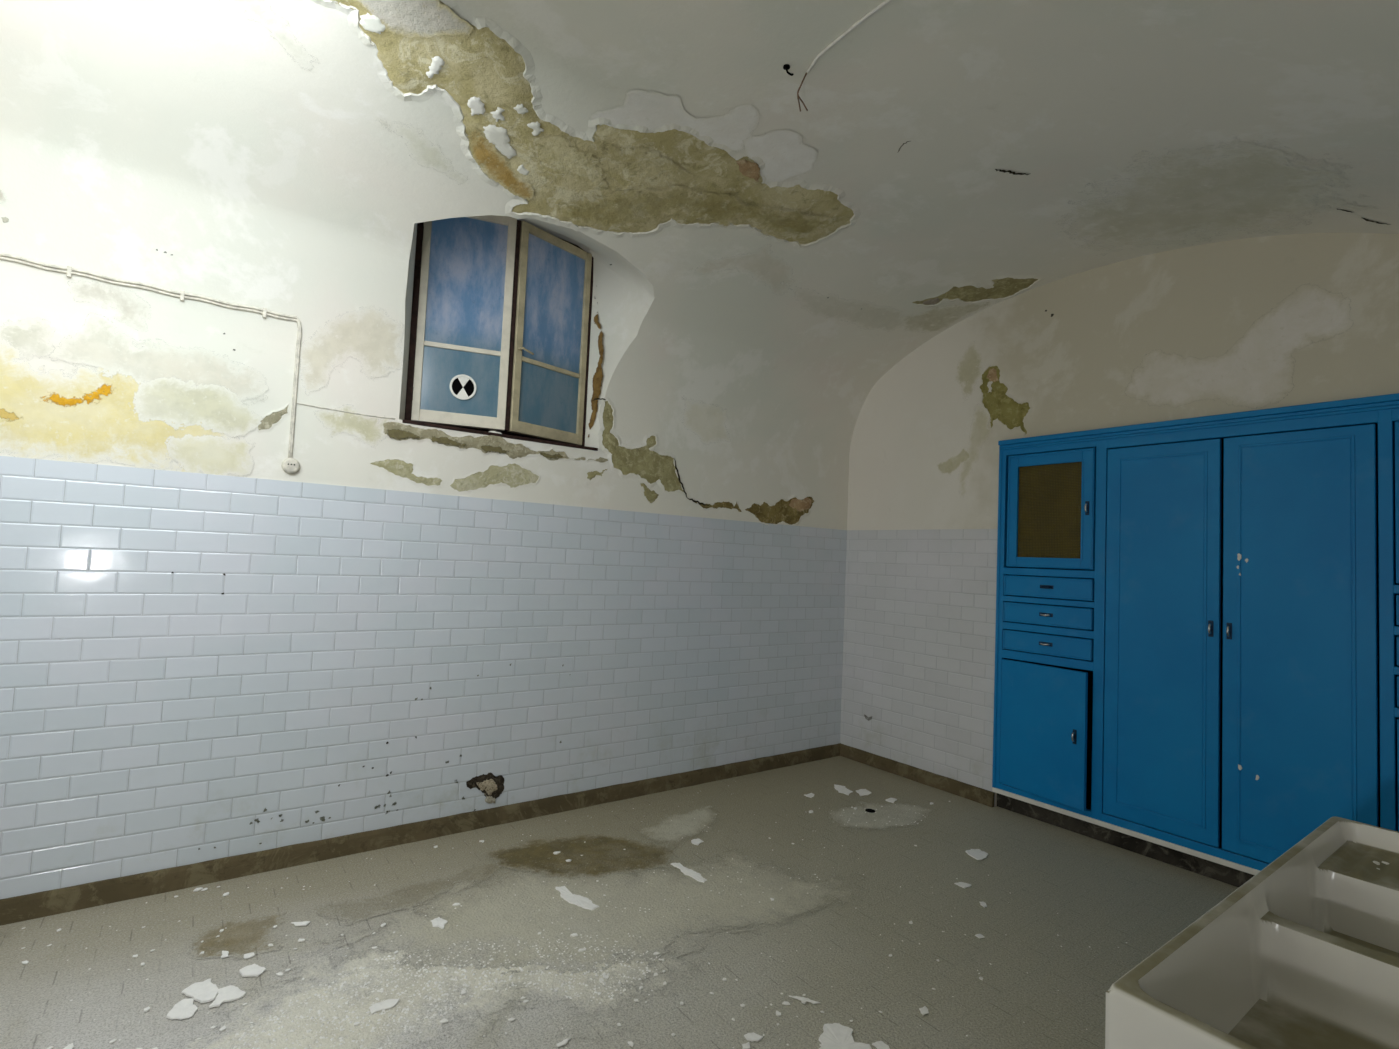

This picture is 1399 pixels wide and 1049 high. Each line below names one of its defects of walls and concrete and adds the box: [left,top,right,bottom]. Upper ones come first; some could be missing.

peeling [311,0,861,248]
leakage [1055,137,1378,256]
peeling [908,274,1046,308]
leakage [0,280,269,477]
peeling [977,363,1033,438]
peeling [367,397,816,526]
spalling [466,772,504,803]